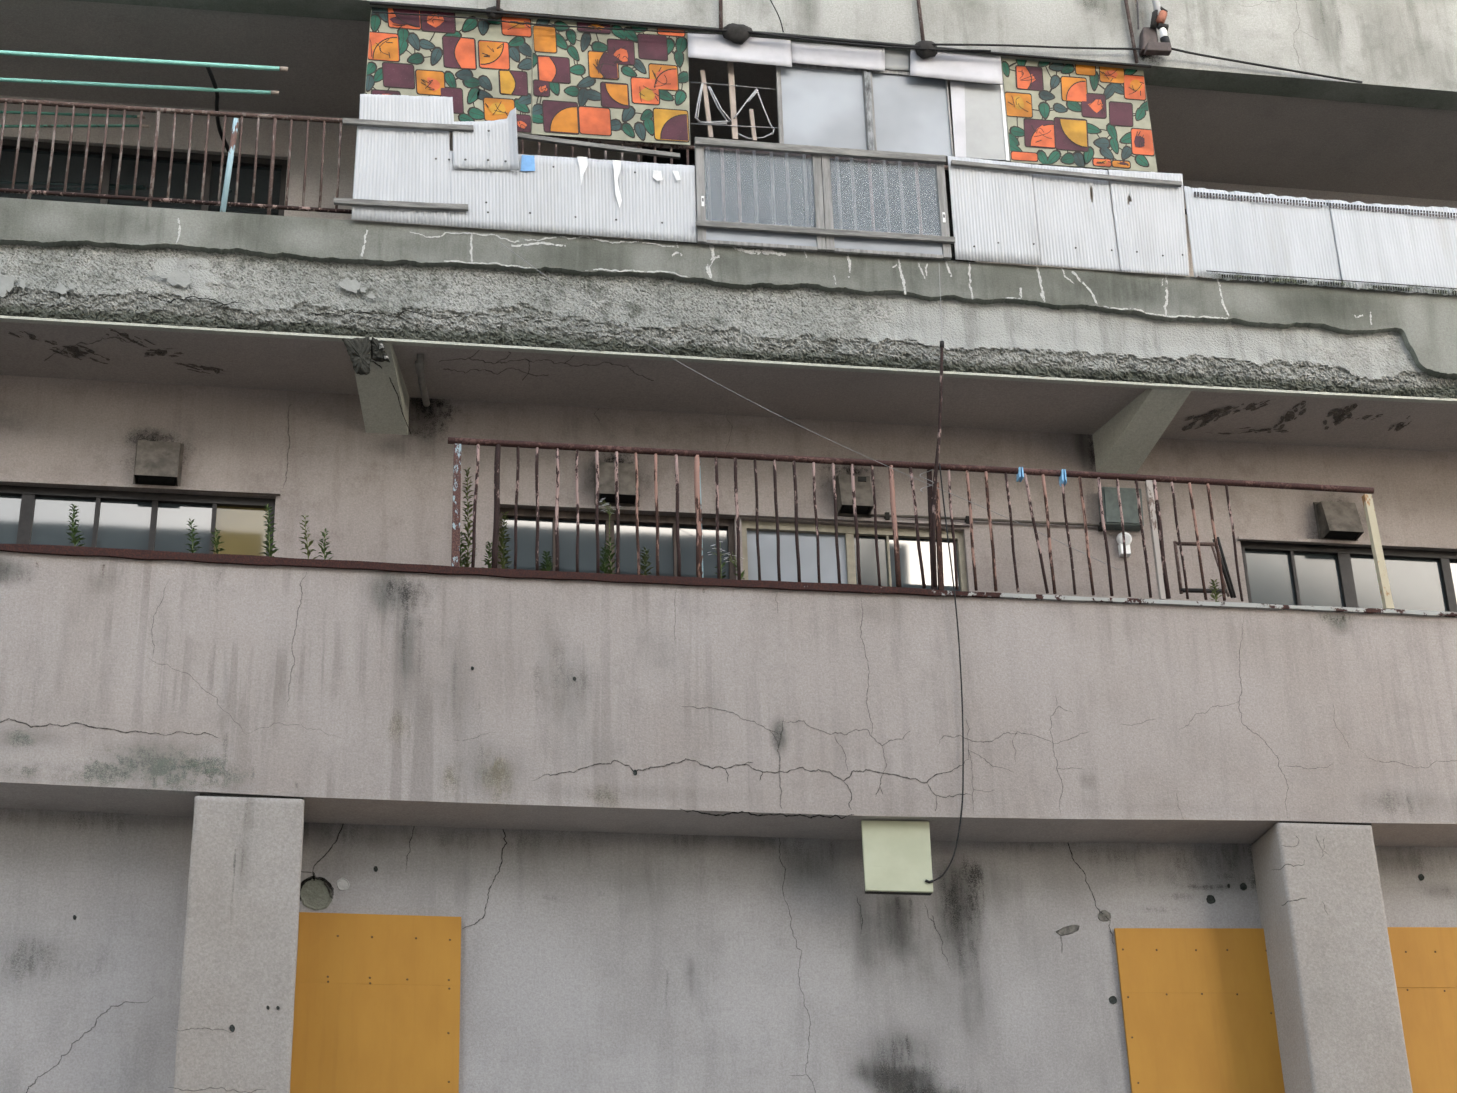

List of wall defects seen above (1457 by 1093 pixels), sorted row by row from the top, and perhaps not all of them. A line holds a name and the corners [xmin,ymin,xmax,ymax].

peeling [0,275,26,298]
peeling [54,284,75,301]
peeling [147,270,193,288]
peeling [338,278,376,299]
crack [288,572,307,701]
crack [0,718,218,738]
water stain [84,751,224,785]
crack [1180,619,1453,914]
crack [538,608,1114,1090]
crack [463,829,507,929]
crack [26,997,153,1093]